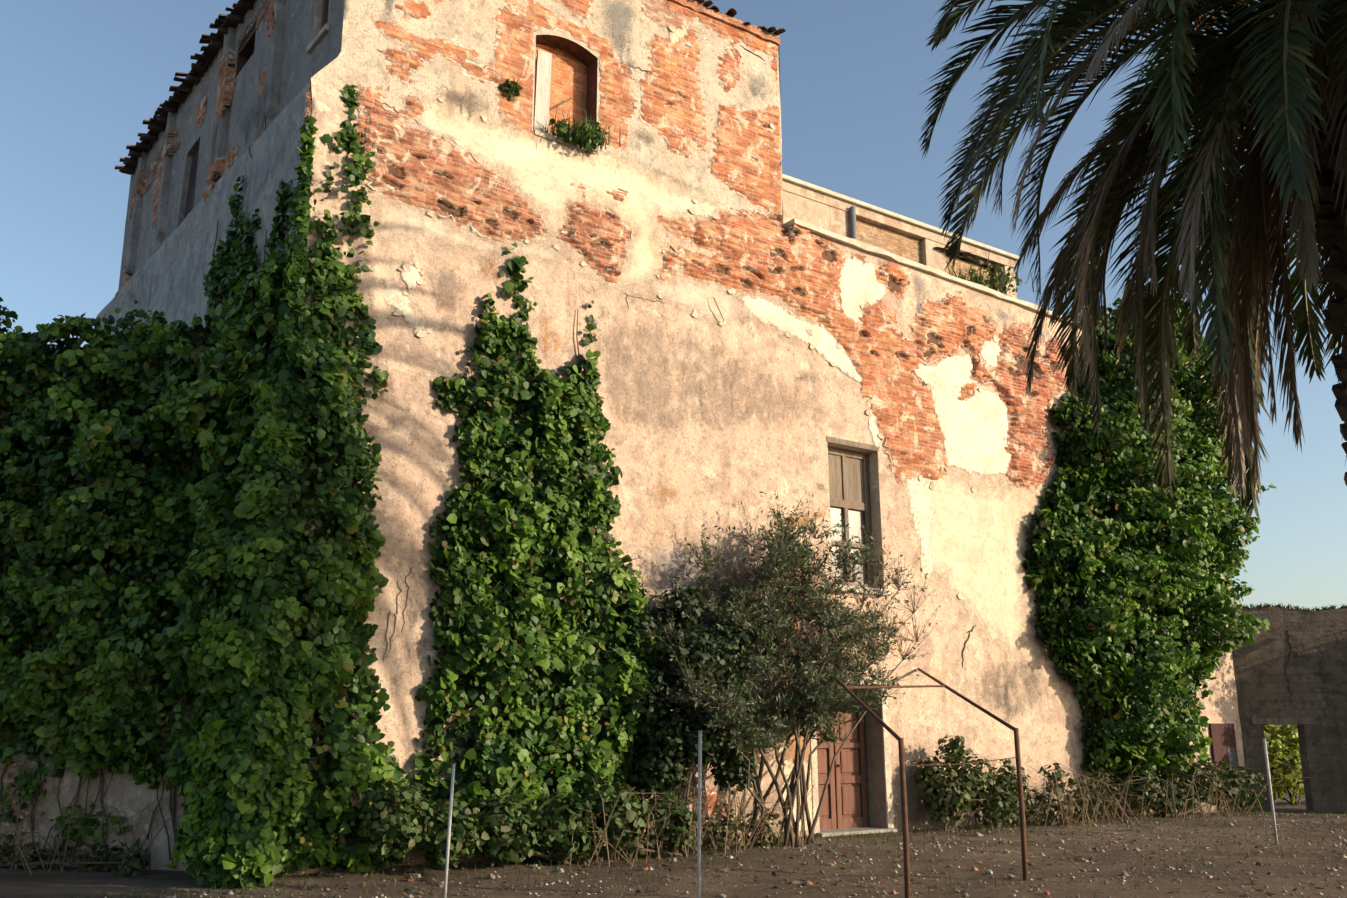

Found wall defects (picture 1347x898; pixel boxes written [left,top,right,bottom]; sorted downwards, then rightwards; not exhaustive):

flaking render [195,48,237,130]
flaking render [203,146,239,202]
spalling [355,0,1077,655]
crack [383,568,412,661]